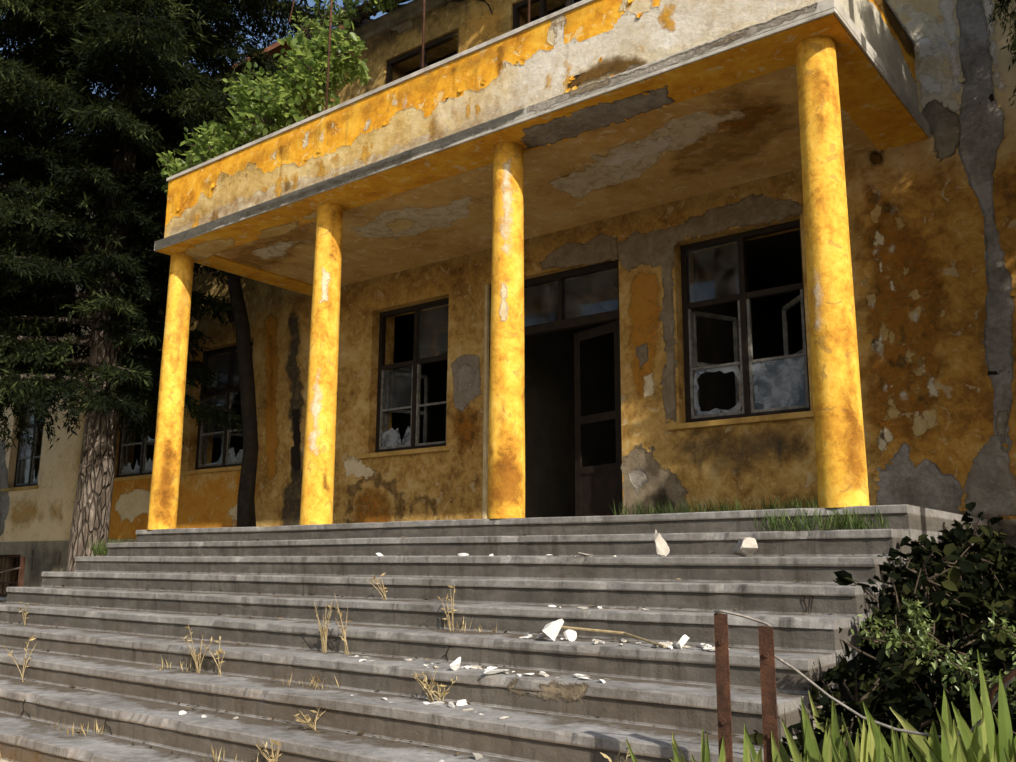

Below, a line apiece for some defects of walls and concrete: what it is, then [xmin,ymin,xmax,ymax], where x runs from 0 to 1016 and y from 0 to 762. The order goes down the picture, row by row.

peeling [164,0,822,252]
peeling [319,268,330,303]
peeling [499,283,509,321]
spalling [538,193,802,423]
peeling [837,0,1016,519]
water stain [282,312,305,526]
peeling [310,376,321,454]
spalling [451,354,481,411]
peeling [115,489,150,522]
peeling [229,504,237,527]
peeling [344,456,374,479]
spalling [620,443,690,515]